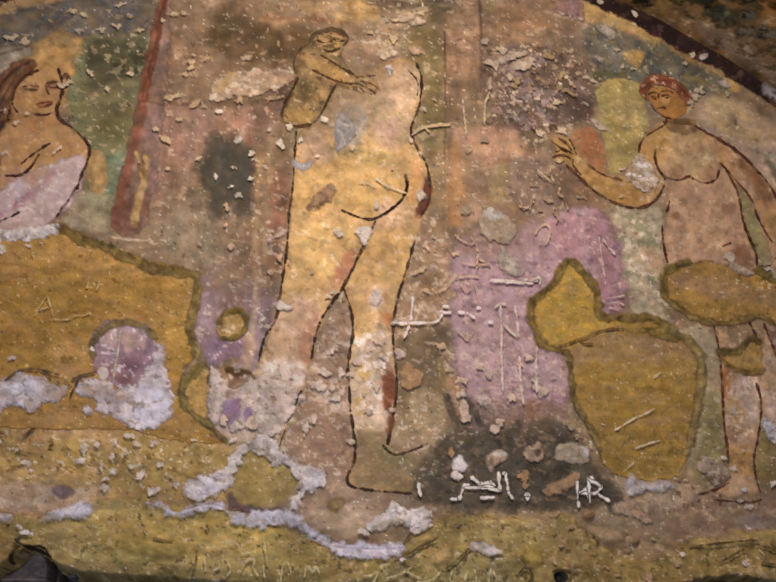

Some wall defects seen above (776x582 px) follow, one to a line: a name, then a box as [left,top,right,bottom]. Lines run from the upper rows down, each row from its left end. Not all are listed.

flaking render [481,38,576,105]
water stain [199,136,253,217]
water stain [425,394,675,514]
water stain [146,492,406,561]